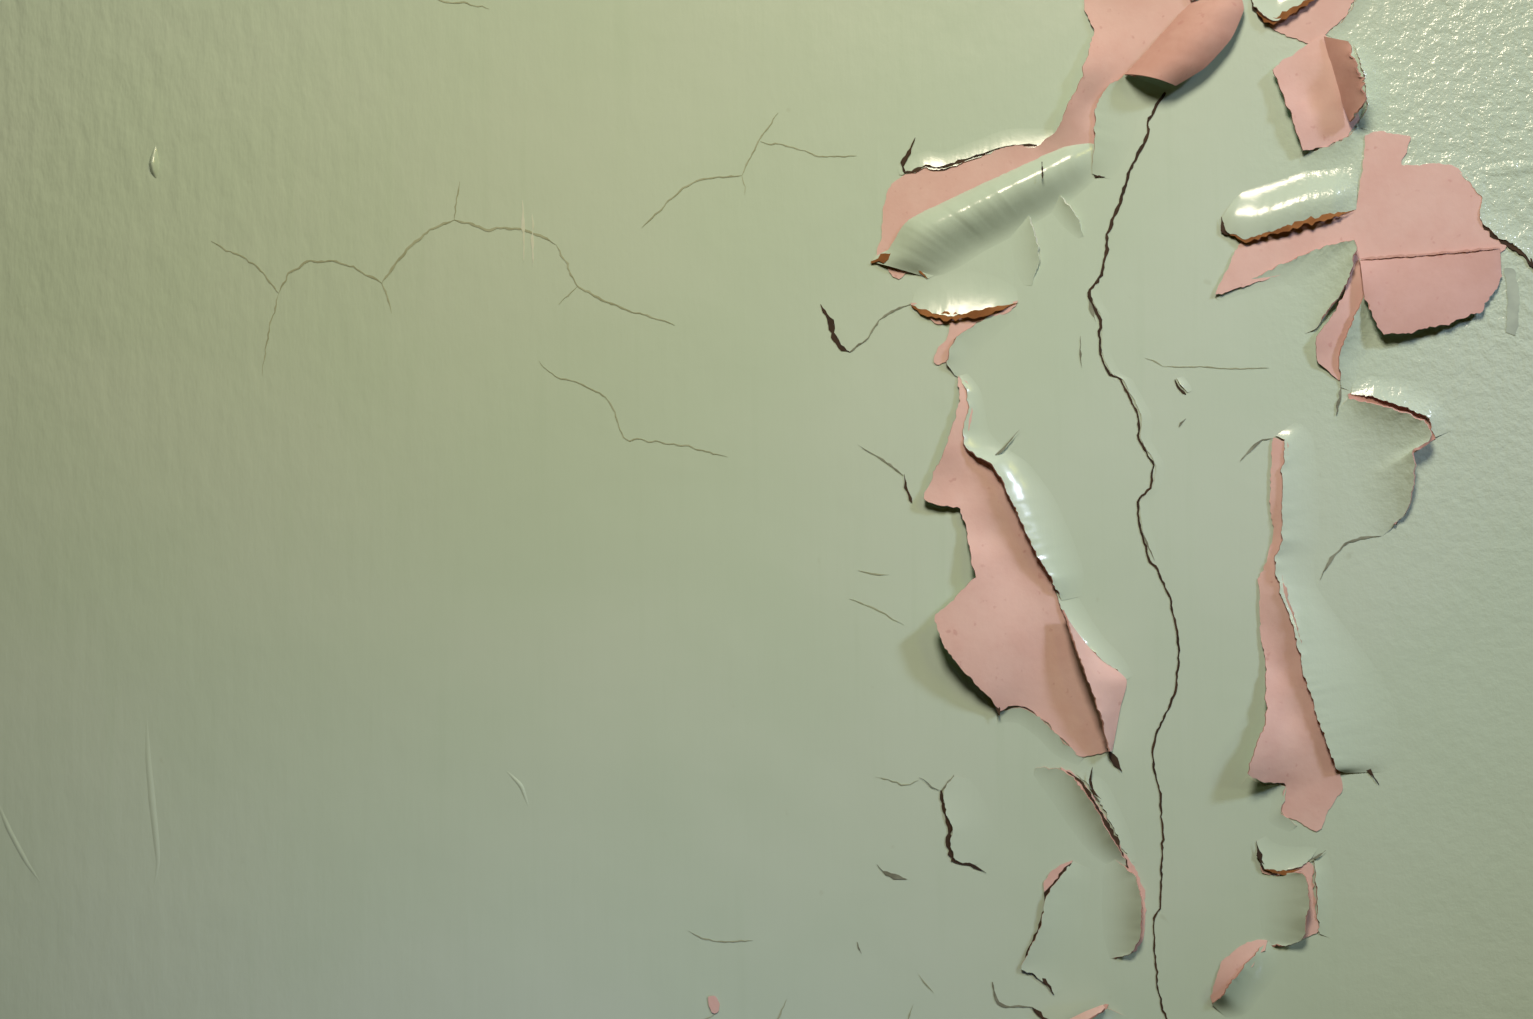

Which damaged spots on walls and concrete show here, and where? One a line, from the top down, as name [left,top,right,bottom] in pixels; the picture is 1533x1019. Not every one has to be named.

crack [644,113,852,225]
crack [211,182,674,373]
crack [539,361,724,456]
crack [1079,92,1265,1019]
peeling [820,0,1533,1019]